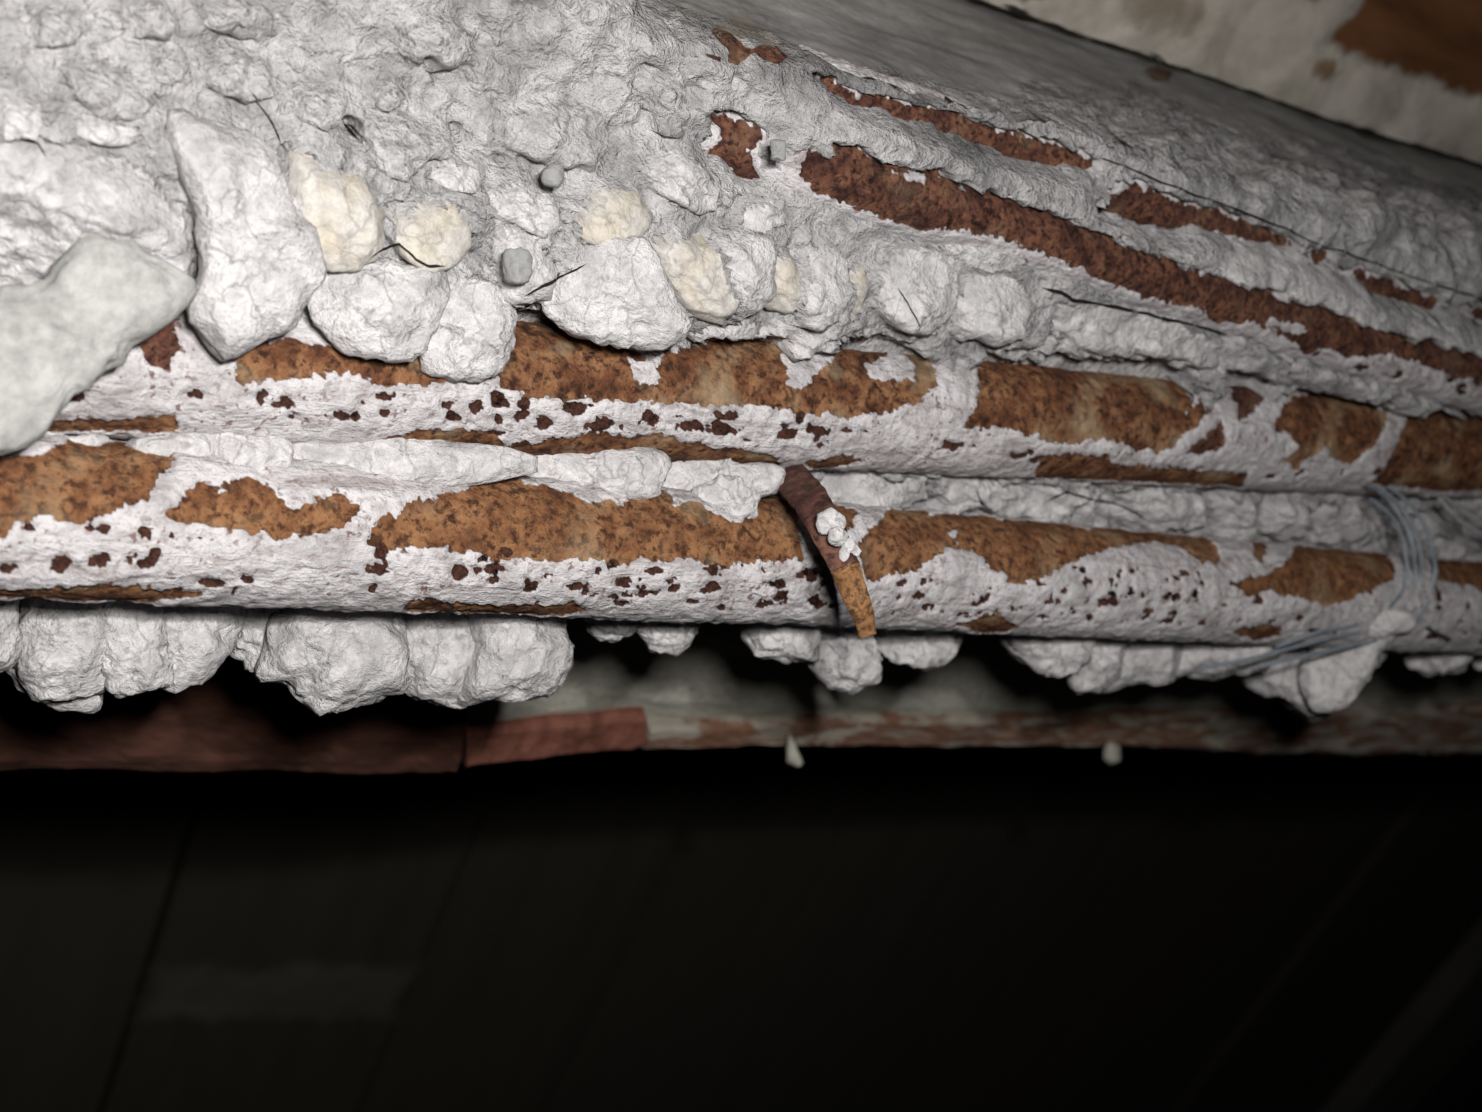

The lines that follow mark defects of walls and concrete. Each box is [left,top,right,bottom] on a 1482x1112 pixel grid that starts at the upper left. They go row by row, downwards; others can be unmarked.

rust [708,113,762,180]
rust [820,75,1092,170]
rust [138,318,180,370]
rust [187,389,204,399]
rust [228,337,449,421]
rust [384,321,938,469]
spalling [0,0,1482,656]
rust [799,142,1482,493]
rust [0,392,360,602]
rust [365,478,835,616]
rust [834,504,1396,641]
rust [1432,559,1482,645]